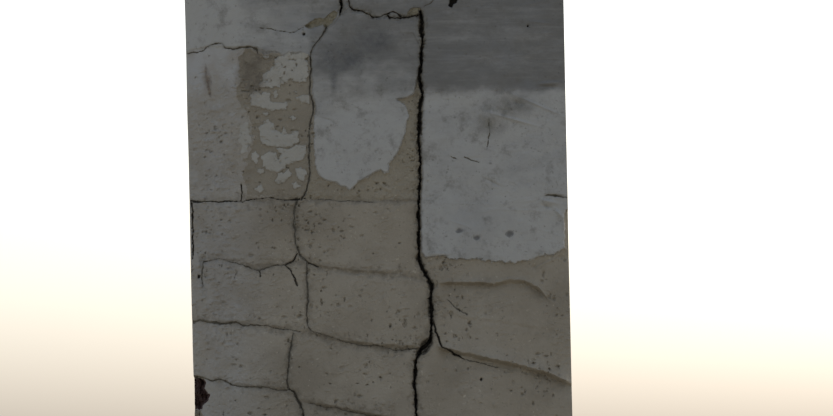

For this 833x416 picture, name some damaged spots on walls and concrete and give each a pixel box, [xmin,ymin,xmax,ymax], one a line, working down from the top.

peeling [236,49,421,202]
crack [188,0,498,416]
flaking render [556,211,569,261]
spalling [194,378,210,416]